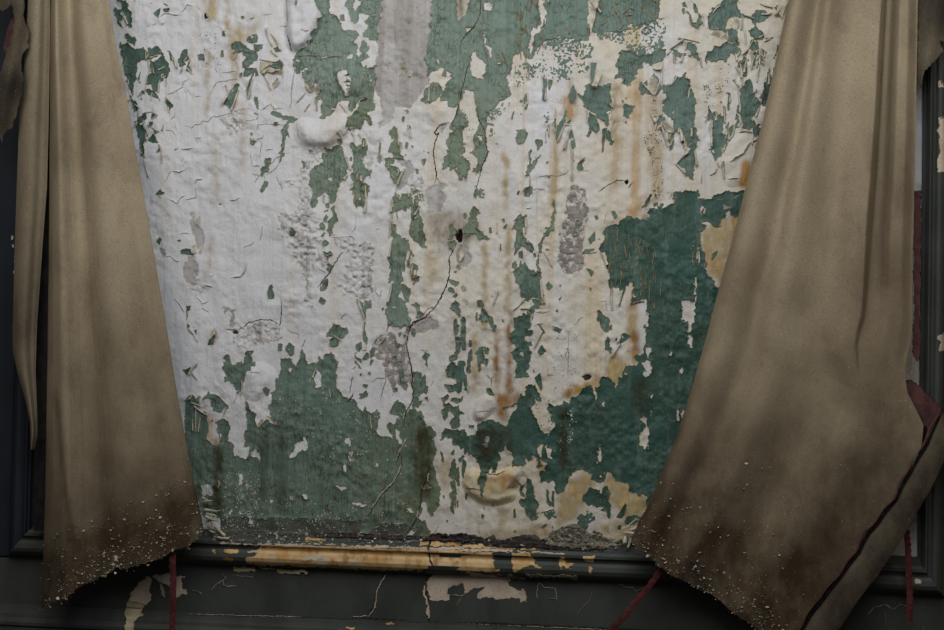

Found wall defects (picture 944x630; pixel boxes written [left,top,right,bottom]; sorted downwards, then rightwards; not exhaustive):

peeling [113,0,205,177]
crack [433,1,489,197]
flaking render [177,213,206,293]
peeling [174,298,216,345]
crack [367,245,456,517]
peeling [184,0,788,619]
corrosion [498,377,520,416]
peeling [124,573,187,630]